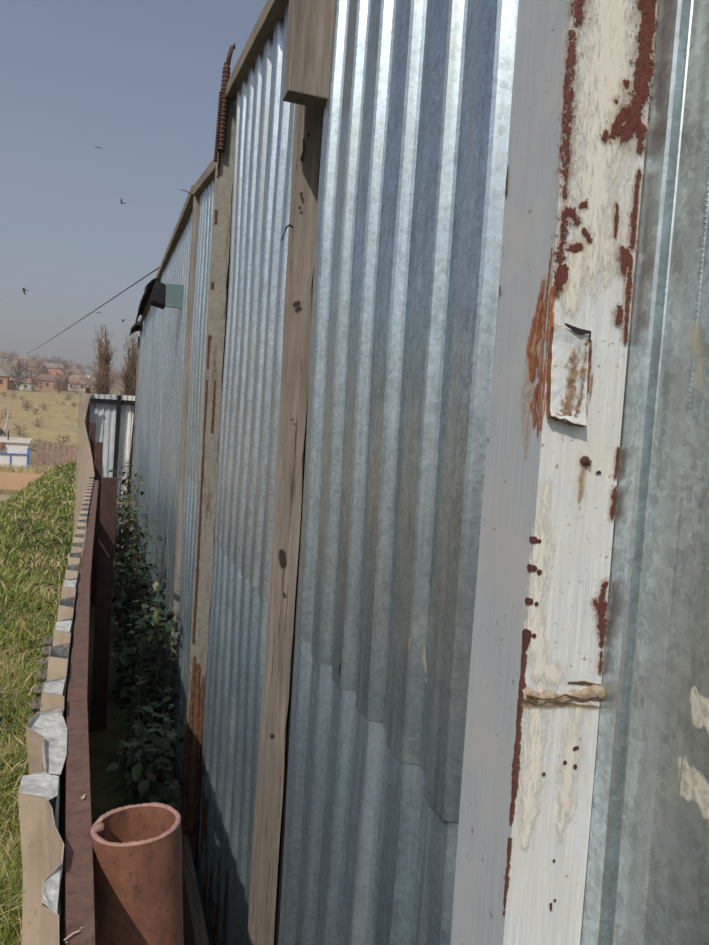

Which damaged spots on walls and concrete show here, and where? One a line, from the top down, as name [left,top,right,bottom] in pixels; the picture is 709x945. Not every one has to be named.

peeling [549,0,658,344]
corrosion [503,628,536,916]
peeling [518,480,591,850]